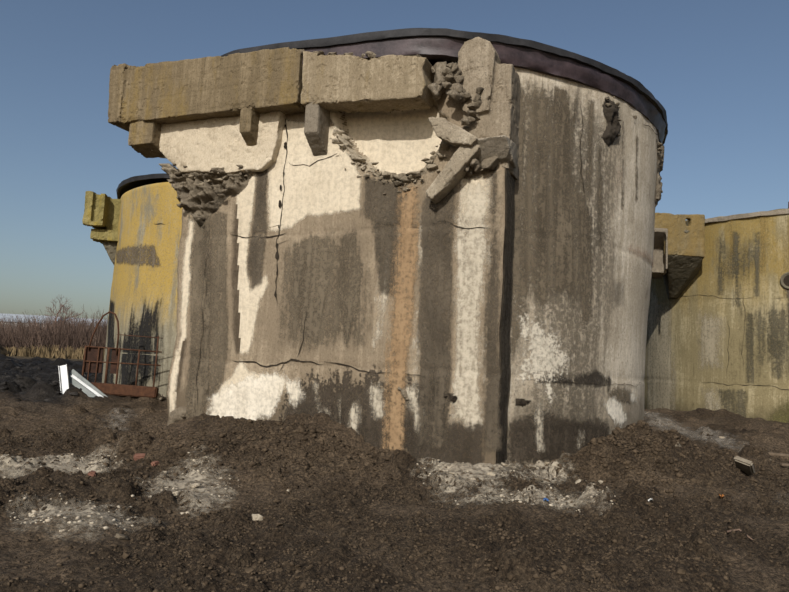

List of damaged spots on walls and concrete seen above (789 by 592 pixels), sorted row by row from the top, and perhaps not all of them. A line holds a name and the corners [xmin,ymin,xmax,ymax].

spalling [159,163,268,426]
damp [186,212,302,421]
damp [248,170,267,288]
crack [230,119,341,300]
crack [234,307,388,374]
peeling [267,61,484,231]
damp [364,177,405,294]
rust [383,187,419,450]
damp [405,189,455,449]
damp [484,84,637,465]
spalling [601,96,622,147]
spalling [655,138,665,207]